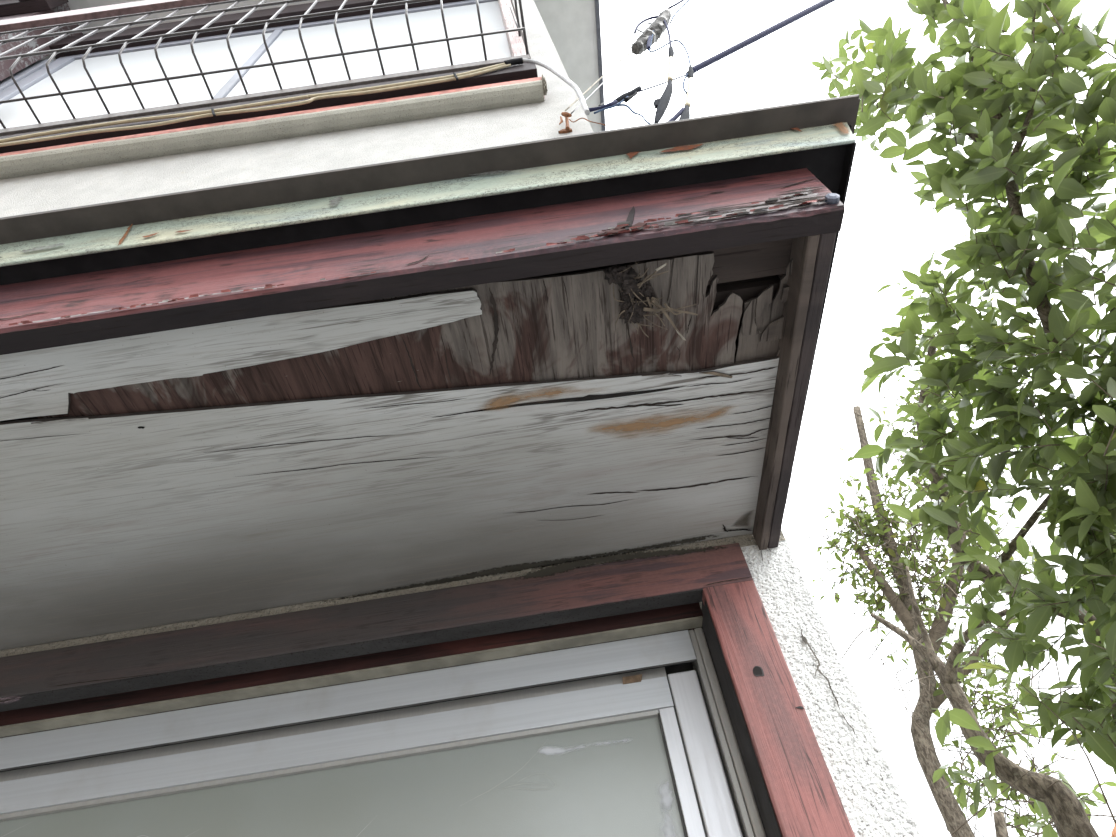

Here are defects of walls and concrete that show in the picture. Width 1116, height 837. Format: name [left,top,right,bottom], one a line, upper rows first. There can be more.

rust [660,144,703,153]
peeling [540,186,829,248]
peeling [8,251,793,424]
crack [365,398,465,409]
water stain [488,390,565,408]
water stain [599,408,726,432]
crack [205,435,449,477]
crack [503,367,776,521]